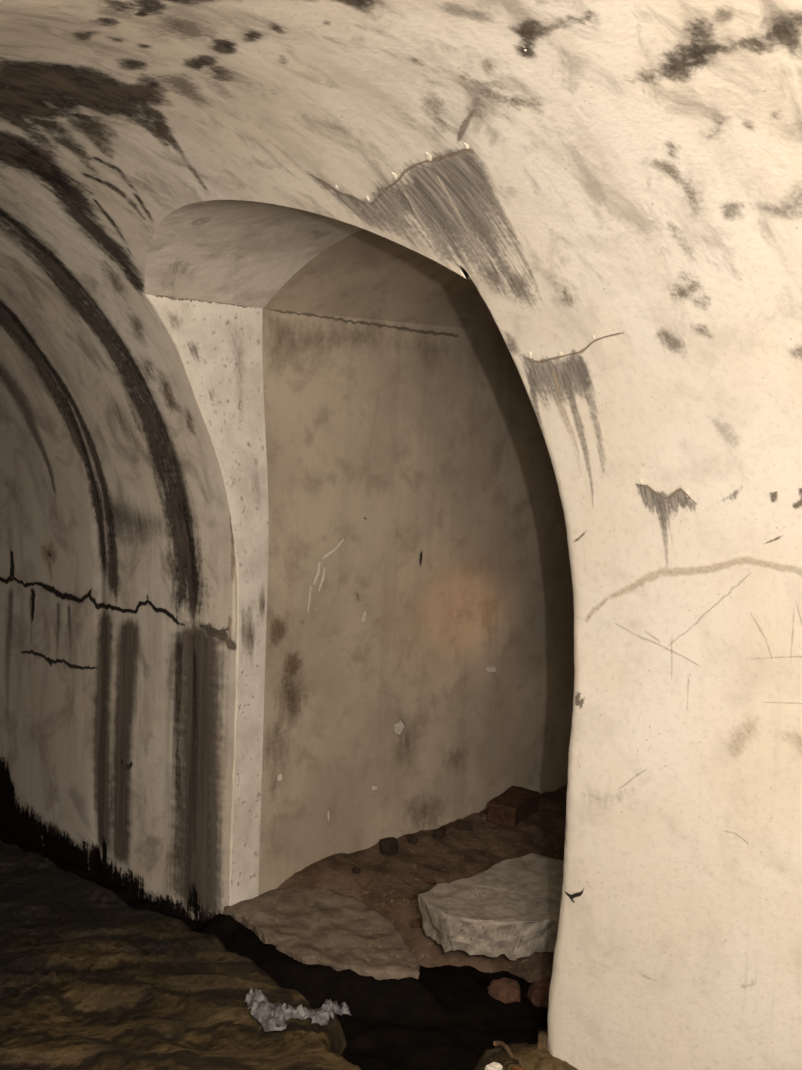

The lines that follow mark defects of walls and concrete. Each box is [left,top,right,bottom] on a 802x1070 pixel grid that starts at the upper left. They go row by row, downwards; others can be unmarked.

leakage [75,0,213,40]
leakage [170,18,282,81]
leakage [645,10,802,82]
leakage [0,58,204,291]
crack [0,550,184,626]
leakage [0,207,221,928]
crack [21,649,96,670]